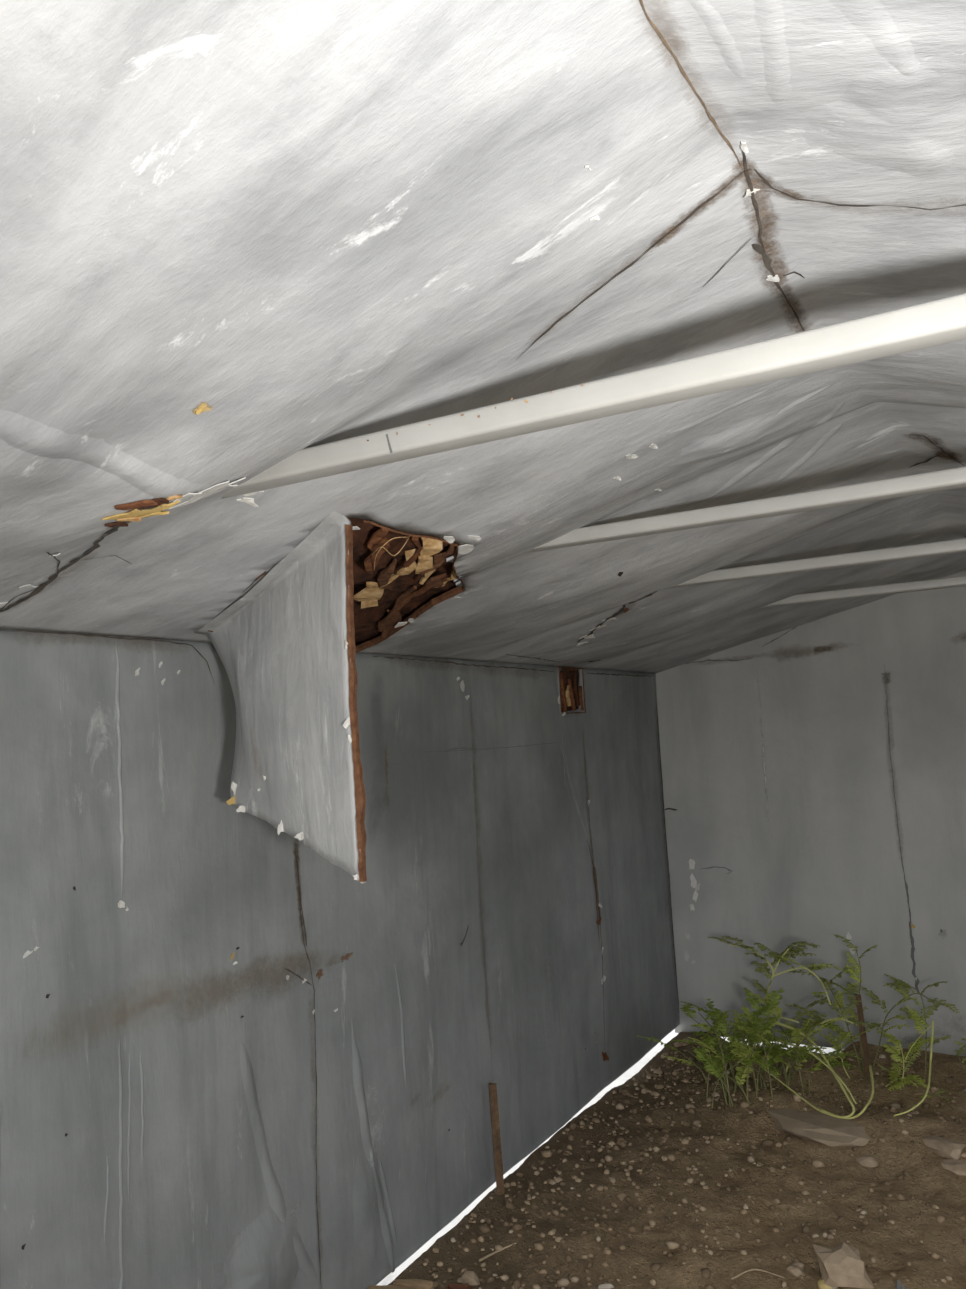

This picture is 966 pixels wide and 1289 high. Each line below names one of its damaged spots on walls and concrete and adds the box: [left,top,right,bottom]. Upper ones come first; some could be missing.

crack [524,0,966,353]
spalling [102,477,264,527]
peeling [443,535,482,554]
crack [0,507,214,681]
spalling [558,660,599,716]
peeling [226,782,245,813]
peeling [277,820,303,840]
crack [884,667,919,993]